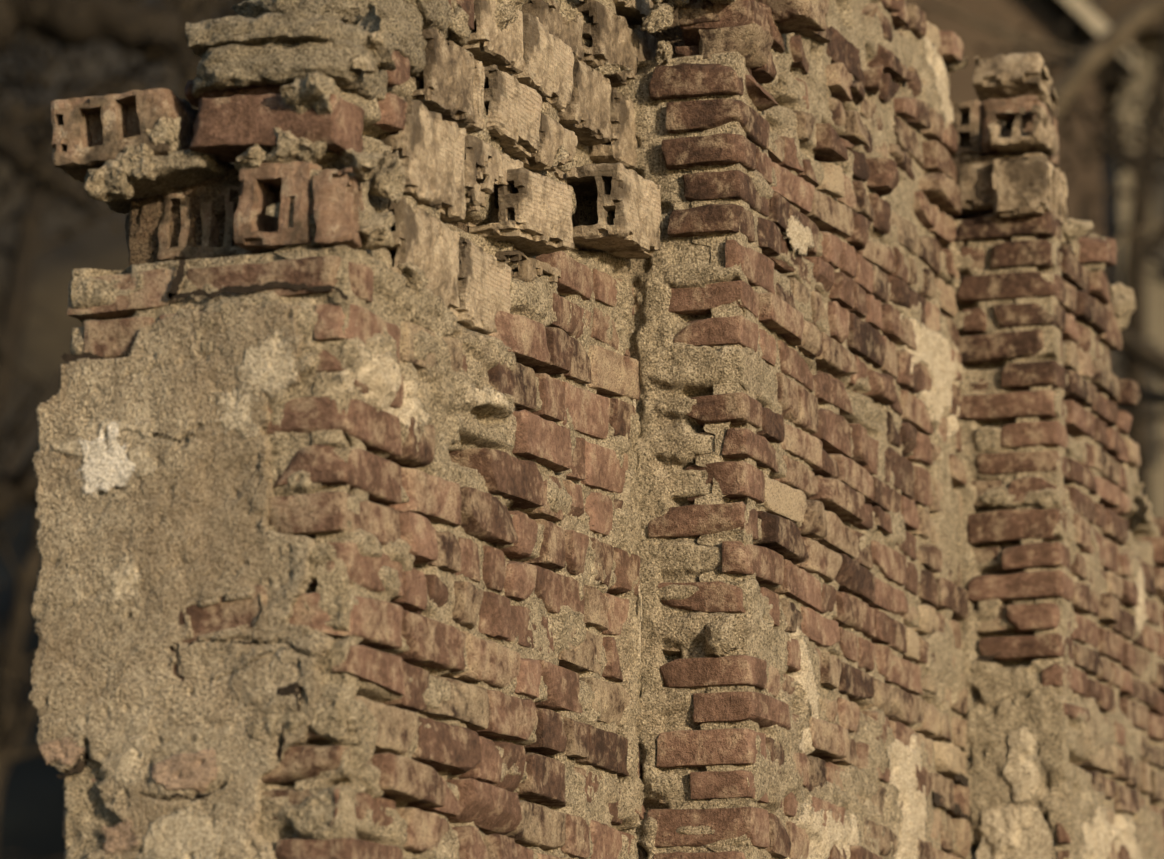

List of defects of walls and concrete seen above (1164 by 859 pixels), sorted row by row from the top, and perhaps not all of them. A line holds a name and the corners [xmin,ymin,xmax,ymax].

flaking render [900,314,963,439]
crack [147,422,201,444]
flaking render [170,585,267,682]
crack [189,638,326,680]
crack [277,682,306,757]
flaking render [976,727,1053,859]